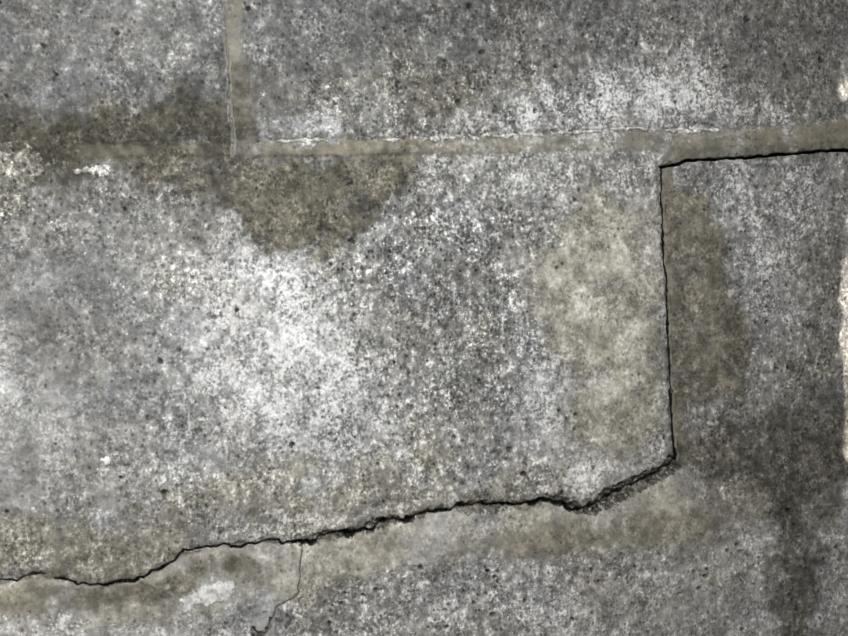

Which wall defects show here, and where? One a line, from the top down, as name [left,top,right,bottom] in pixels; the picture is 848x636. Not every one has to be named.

damp [0,48,832,467]
crack [0,131,848,635]
damp [676,385,848,636]